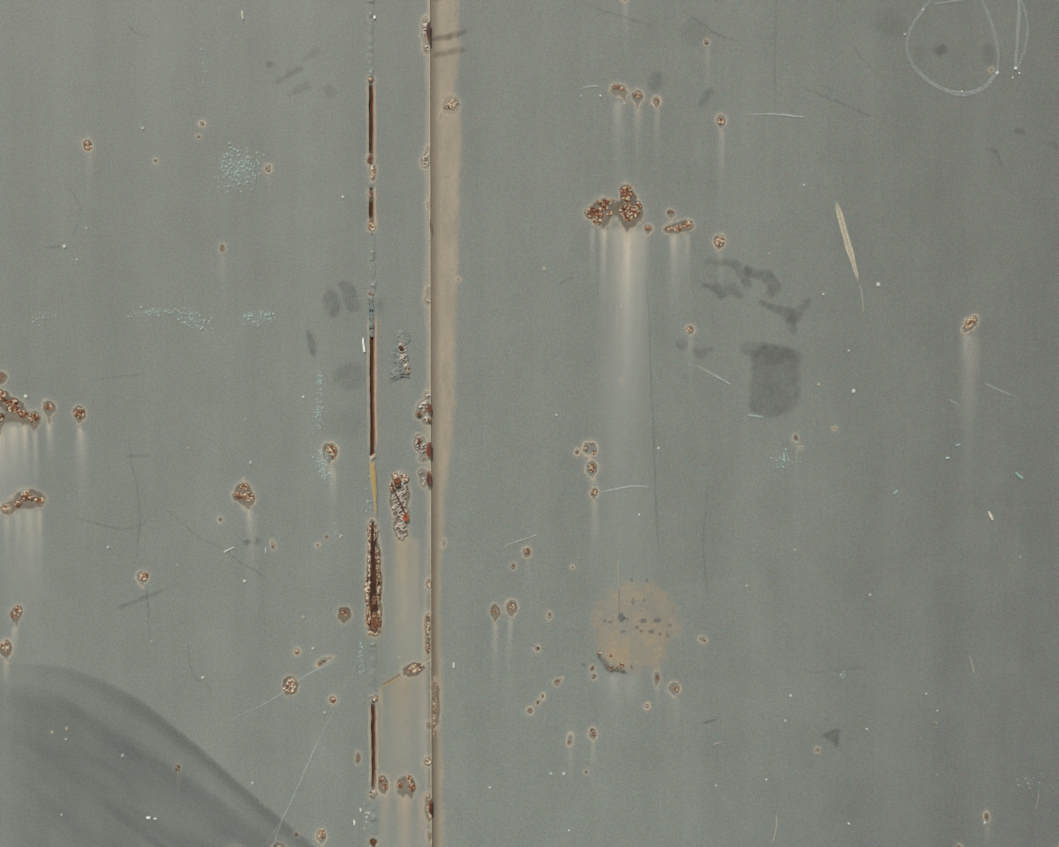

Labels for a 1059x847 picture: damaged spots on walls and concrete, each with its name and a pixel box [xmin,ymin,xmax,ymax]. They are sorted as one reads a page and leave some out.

corrosion [584,184,693,280]
corrosion [0,489,45,515]
corrosion [0,372,54,441]
corrosion [232,482,255,508]
corrosion [321,442,339,464]
corrosion [377,0,460,847]
corrosion [574,441,599,501]
corrosion [364,455,382,636]
corrosion [338,607,351,623]
corrosion [282,676,298,695]